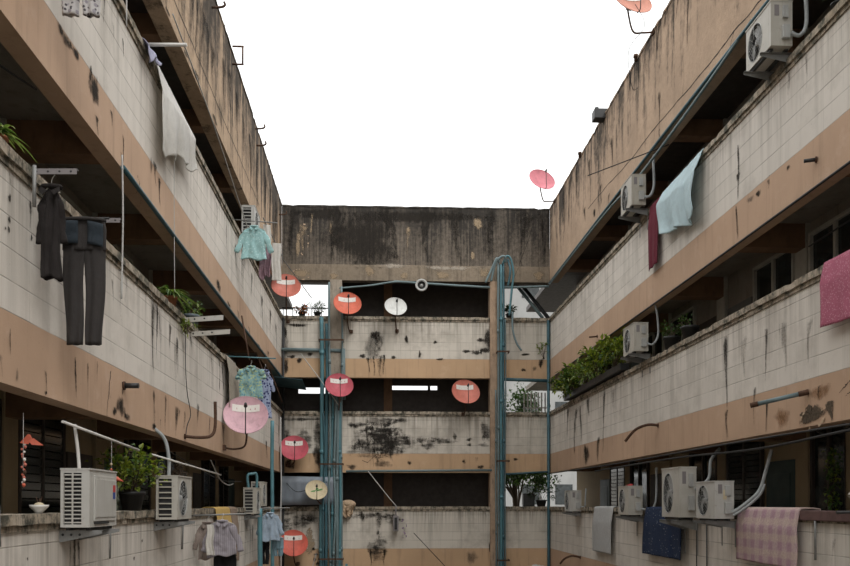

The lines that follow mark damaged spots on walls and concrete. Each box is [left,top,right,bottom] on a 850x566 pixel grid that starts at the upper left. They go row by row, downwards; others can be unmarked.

leakage [90,68,99,103]
leakage [192,0,277,232]
leakage [288,207,495,265]
leakage [360,332,395,373]
leakage [463,324,490,355]
leakage [113,382,129,419]
leakage [349,418,456,466]
leakage [356,512,400,559]